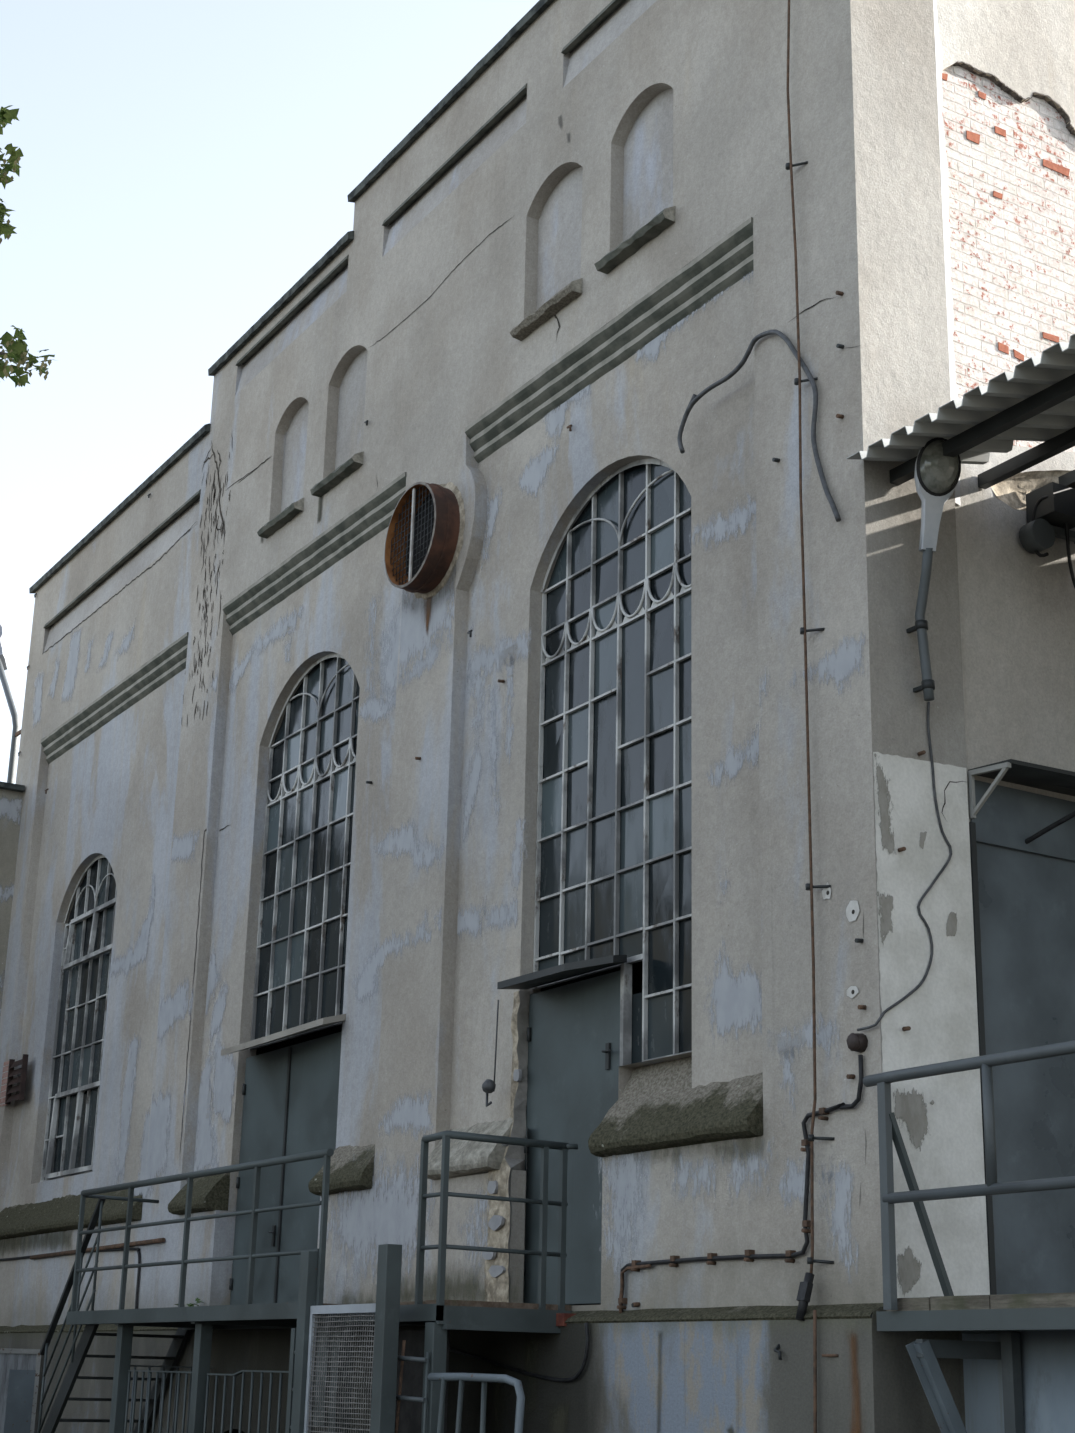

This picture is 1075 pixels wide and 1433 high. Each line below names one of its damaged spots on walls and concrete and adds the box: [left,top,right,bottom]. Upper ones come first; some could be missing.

flaking render [942,61,1075,400]
crack [370,218,511,347]
flaking render [1013,440,1043,448]
peeling [0,797,23,824]
peeling [874,754,894,853]
peeling [877,891,893,943]
peeling [705,951,762,1038]
spalling [0,1061,9,1107]
peeling [777,1013,837,1105]
peeling [893,1088,934,1151]
peeling [897,1246,922,1295]